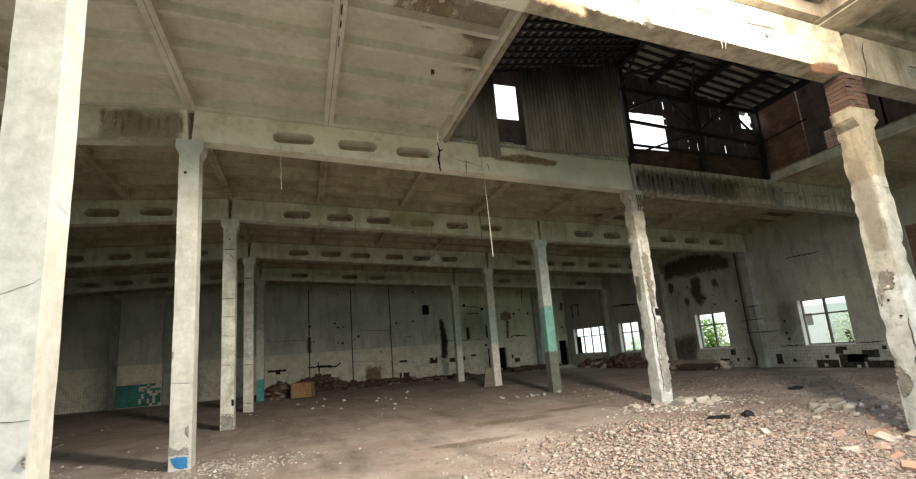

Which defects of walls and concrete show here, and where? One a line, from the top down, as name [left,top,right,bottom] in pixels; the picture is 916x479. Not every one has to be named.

spalling [877,269,895,307]